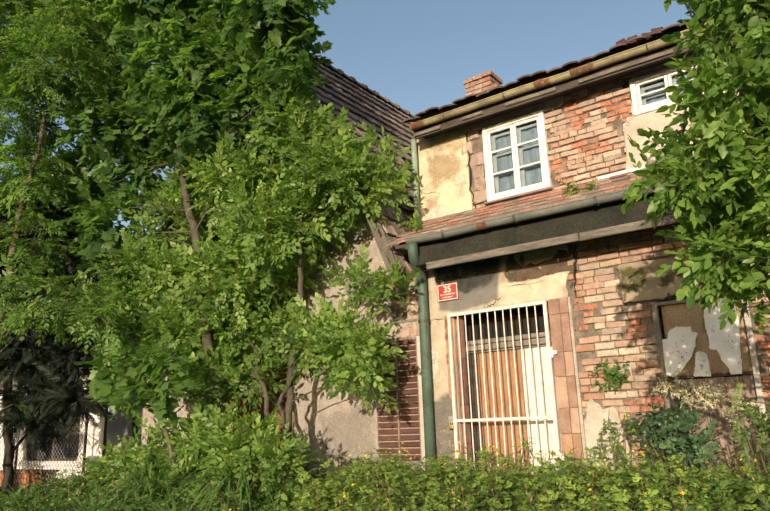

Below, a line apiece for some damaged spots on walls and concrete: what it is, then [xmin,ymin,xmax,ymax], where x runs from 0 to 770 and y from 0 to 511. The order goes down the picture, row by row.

spalling [544,75,632,190]
spalling [505,224,693,477]
spalling [749,291,770,397]